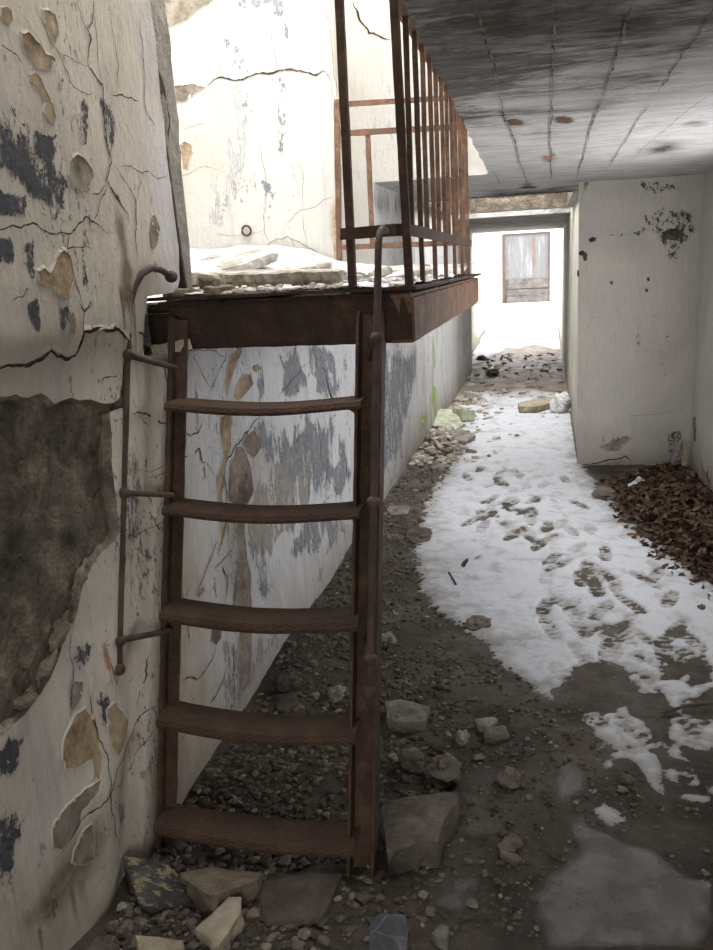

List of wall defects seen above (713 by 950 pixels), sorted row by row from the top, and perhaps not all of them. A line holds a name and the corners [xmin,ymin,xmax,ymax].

peeling [0,5,94,222]
crack [0,0,223,249]
crack [208,2,337,99]
crack [475,3,558,184]
crack [611,9,713,163]
crack [0,279,148,369]
peeling [198,414,351,505]
peeling [280,345,339,398]
peeling [609,209,694,262]
spalling [0,364,124,776]
spalling [50,642,129,866]
crack [54,626,155,863]